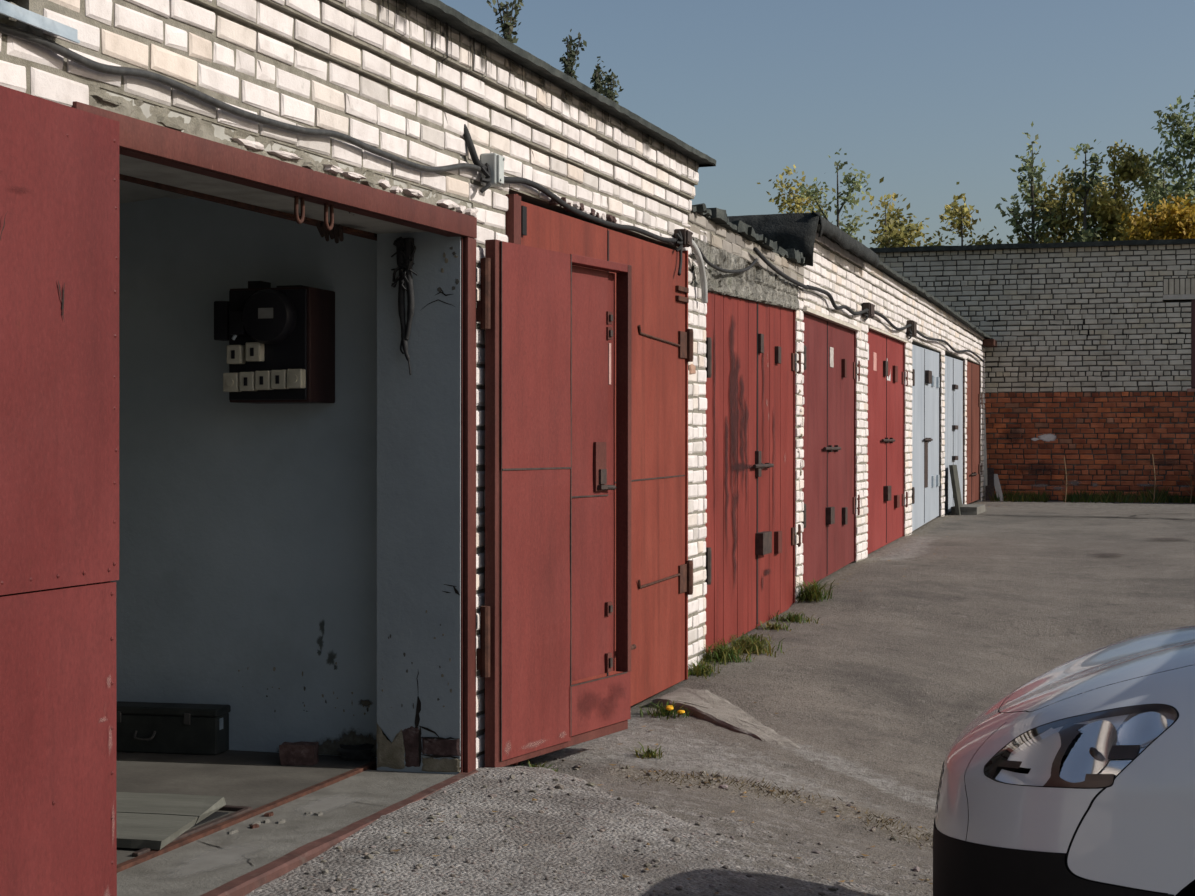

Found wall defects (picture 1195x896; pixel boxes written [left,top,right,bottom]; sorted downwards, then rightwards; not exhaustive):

peeling [317,621,337,669]
flaking render [318,692,461,773]